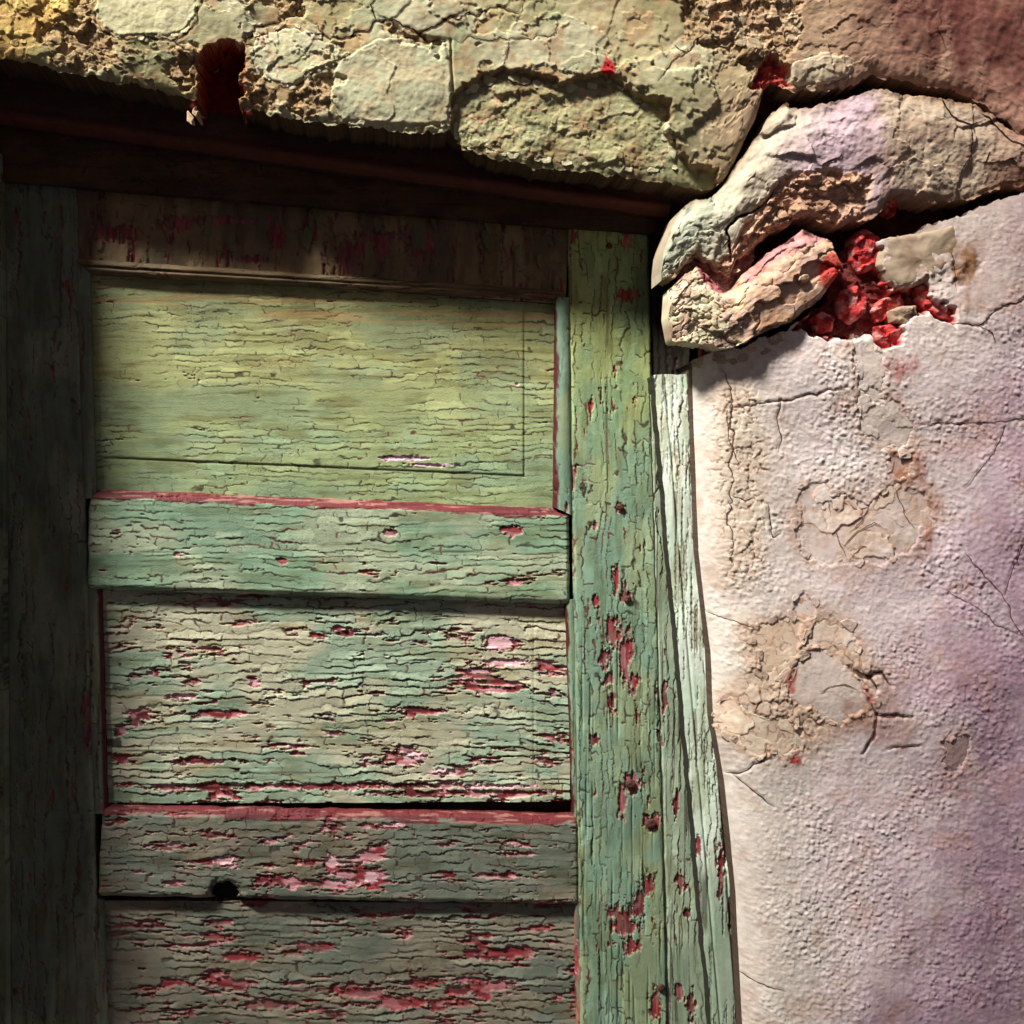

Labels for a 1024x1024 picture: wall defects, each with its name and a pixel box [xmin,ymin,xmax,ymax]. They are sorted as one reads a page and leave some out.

crack [722,369,849,568]
peeling [791,332,934,568]
crack [922,418,1024,479]
crack [947,544,1024,637]
spalling [750,595,881,726]
peeling [711,694,805,761]
crack [852,669,916,754]
crack [728,749,773,806]